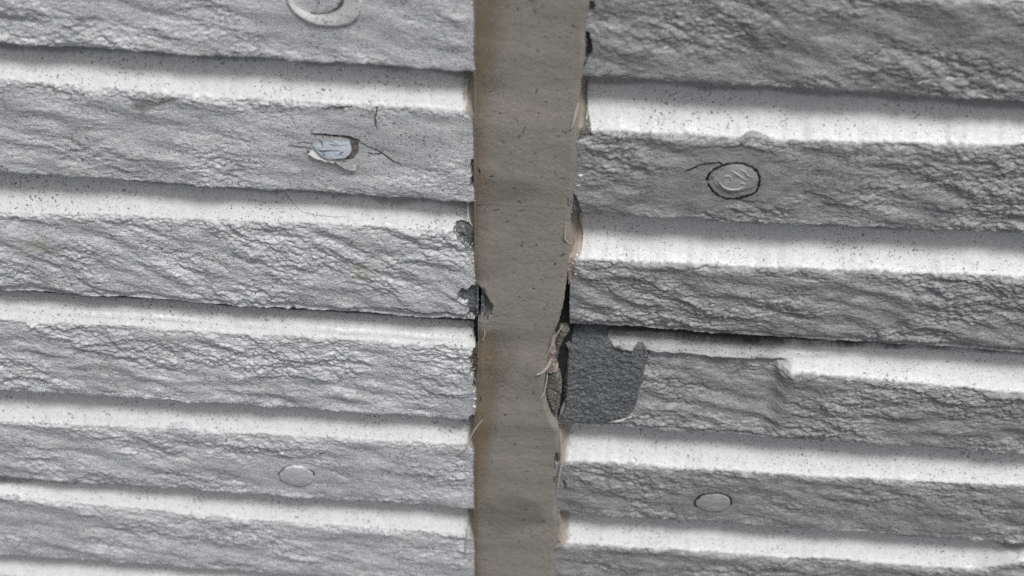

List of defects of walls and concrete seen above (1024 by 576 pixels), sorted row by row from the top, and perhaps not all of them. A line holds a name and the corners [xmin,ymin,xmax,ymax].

peeling [307,133,359,171]
spalling [453,220,479,317]
spalling [557,323,650,423]